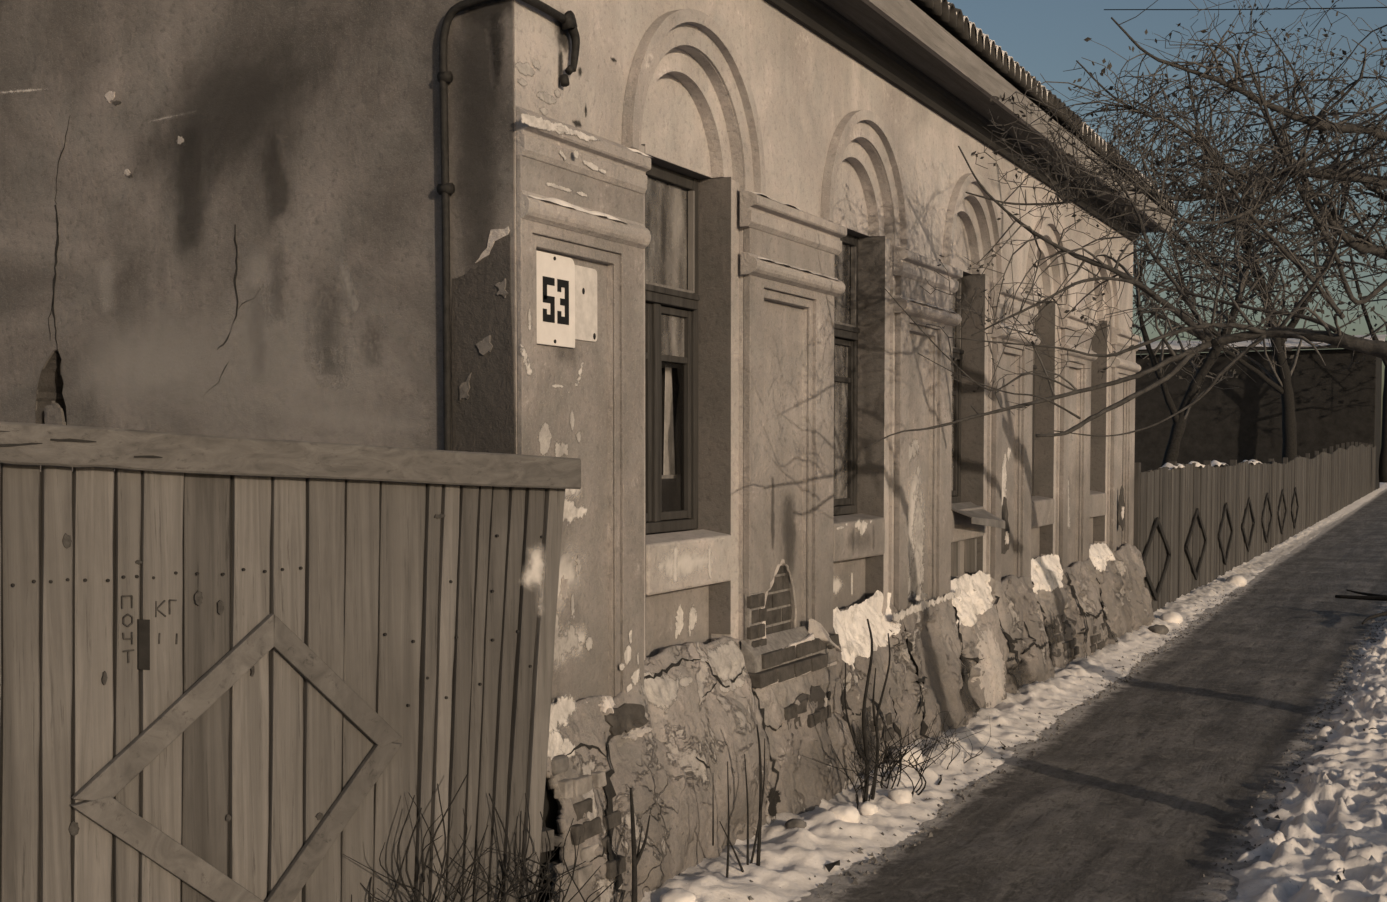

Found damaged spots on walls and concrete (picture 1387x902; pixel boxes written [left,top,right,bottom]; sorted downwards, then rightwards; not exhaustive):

crack [48,117,70,351]
peeling [521,107,606,174]
peeling [546,182,587,197]
crack [204,224,261,395]
spalling [452,227,535,454]
peeling [553,593,593,667]
spalling [547,630,693,760]
peeling [675,604,697,640]
crack [644,658,782,790]
flaking render [700,559,842,741]
flaking render [554,771,626,888]
spalling [765,787,781,817]